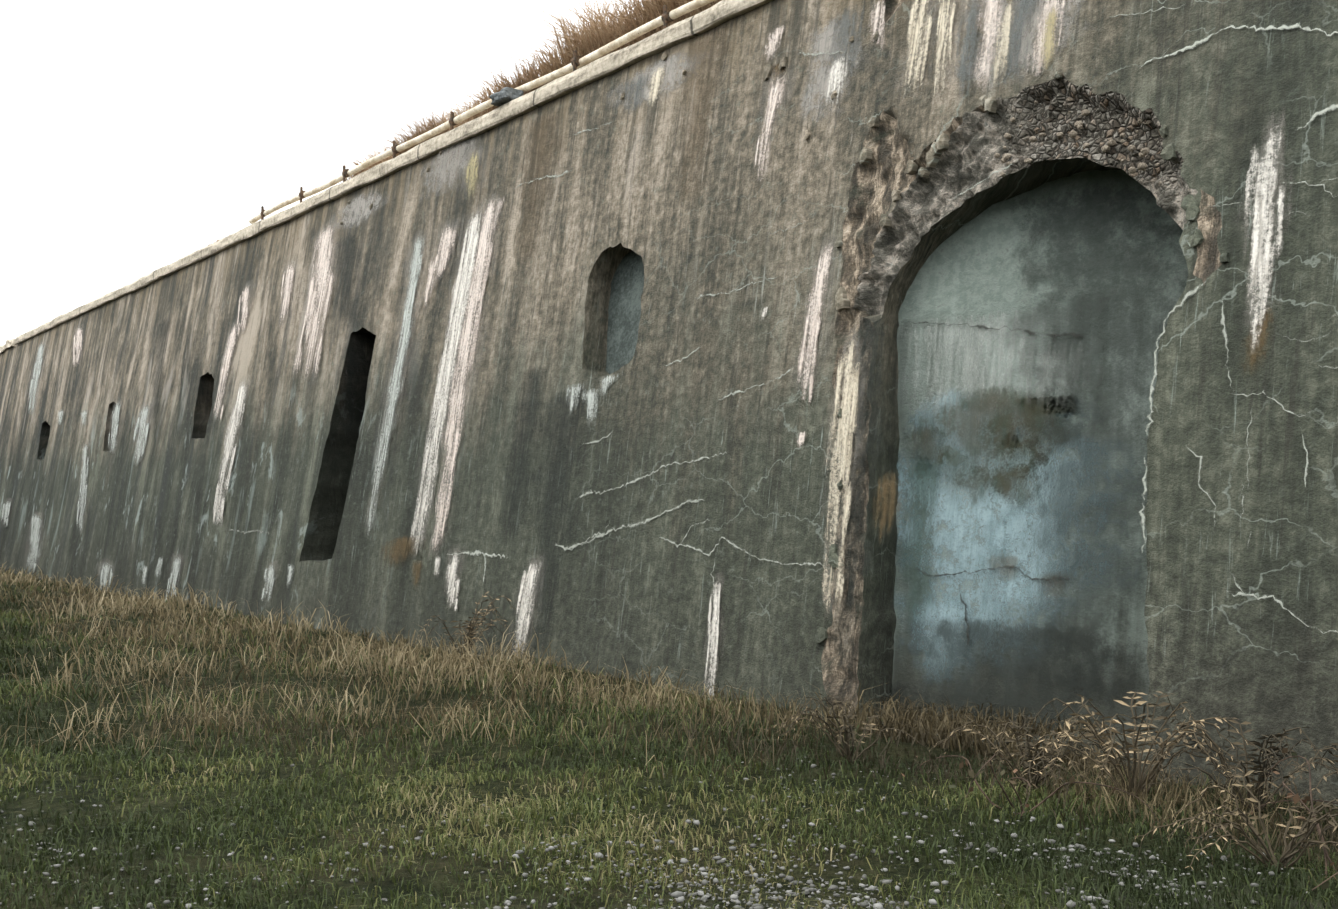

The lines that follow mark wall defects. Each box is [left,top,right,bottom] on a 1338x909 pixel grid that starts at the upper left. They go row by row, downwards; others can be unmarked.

damp [871,1,885,43]
damp [905,0,956,94]
crack [1141,23,1338,67]
crack [1299,104,1338,129]
damp [213,287,250,521]
damp [293,226,336,374]
damp [367,199,504,611]
spalling [802,0,1229,721]
crack [1139,282,1316,551]
damp [1245,136,1284,348]
crack [556,452,824,589]
crack [1226,579,1337,634]